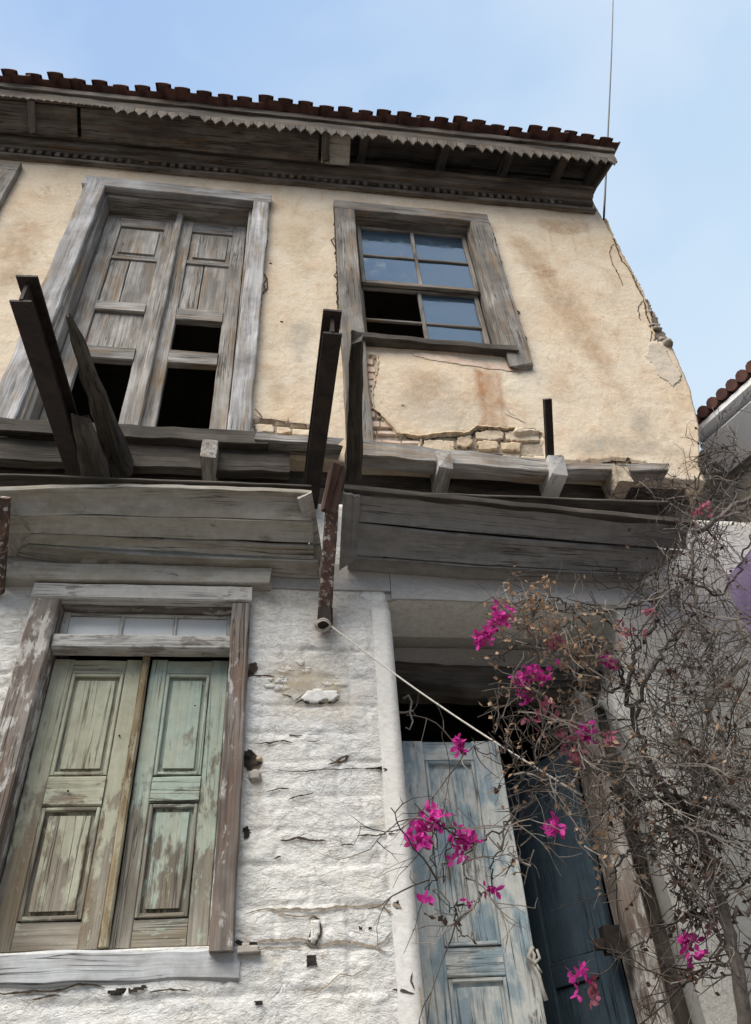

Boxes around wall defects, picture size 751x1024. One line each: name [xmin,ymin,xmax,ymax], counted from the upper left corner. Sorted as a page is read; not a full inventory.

crack [609,237,652,342]
spalling [411,351,522,373]
spalling [367,359,544,457]
peeling [264,659,347,705]
spalling [244,749,262,783]
crack [256,734,387,800]
crack [274,833,397,859]
crack [235,912,322,950]
crack [294,903,402,996]
crack [0,983,106,1001]
crack [149,986,188,994]